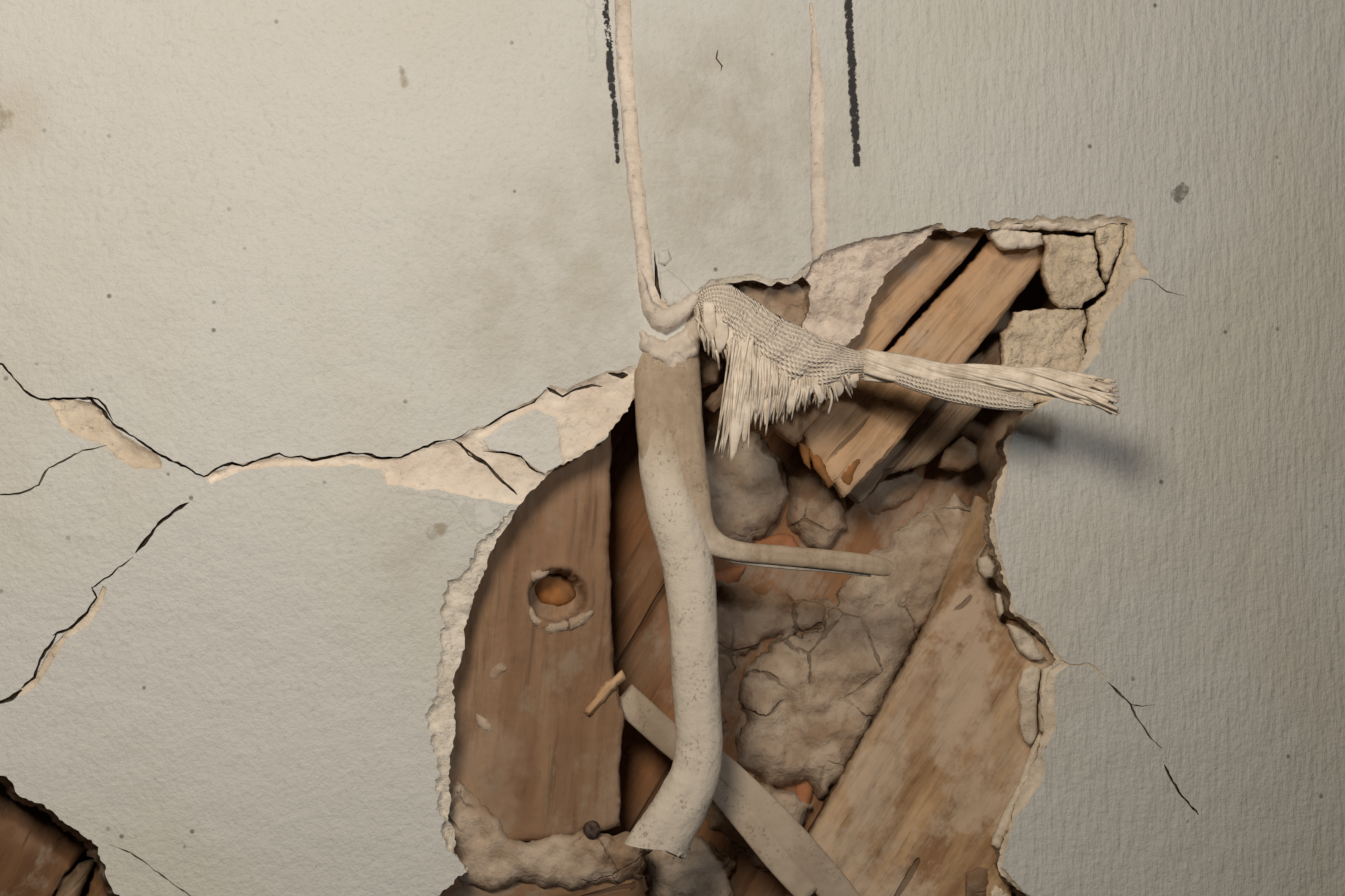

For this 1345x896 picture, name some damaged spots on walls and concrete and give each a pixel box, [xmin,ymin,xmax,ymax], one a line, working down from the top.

spalling [659,214,1149,373]
crack [0,363,628,704]
spalling [205,366,637,872]
peeling [754,533,800,547]
spalling [965,392,1069,896]
crack [1057,659,1199,815]
spalling [0,776,120,896]